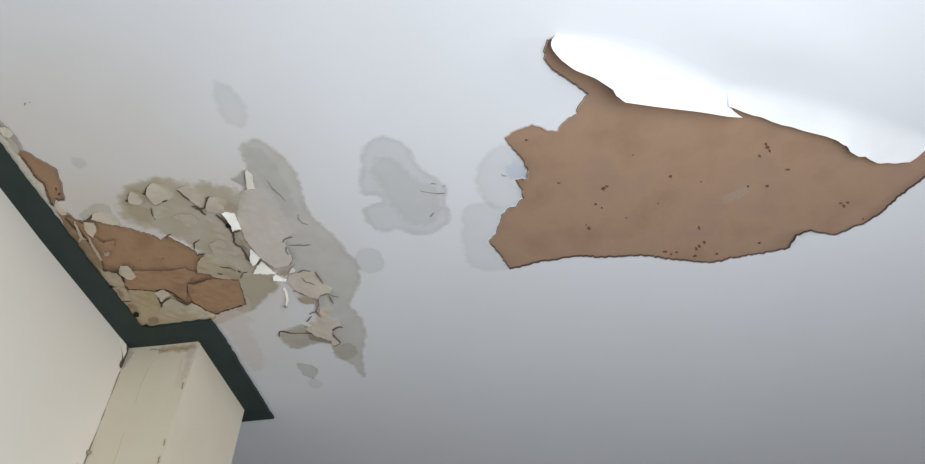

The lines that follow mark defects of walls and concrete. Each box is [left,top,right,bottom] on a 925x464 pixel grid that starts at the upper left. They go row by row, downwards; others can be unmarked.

peeling [0,127,248,327]
crack [216,170,339,322]
peeling [277,264,292,277]
water stain [208,76,387,380]
peeling [274,291,343,350]
water stain [355,133,522,273]
peeling [487,31,925,271]